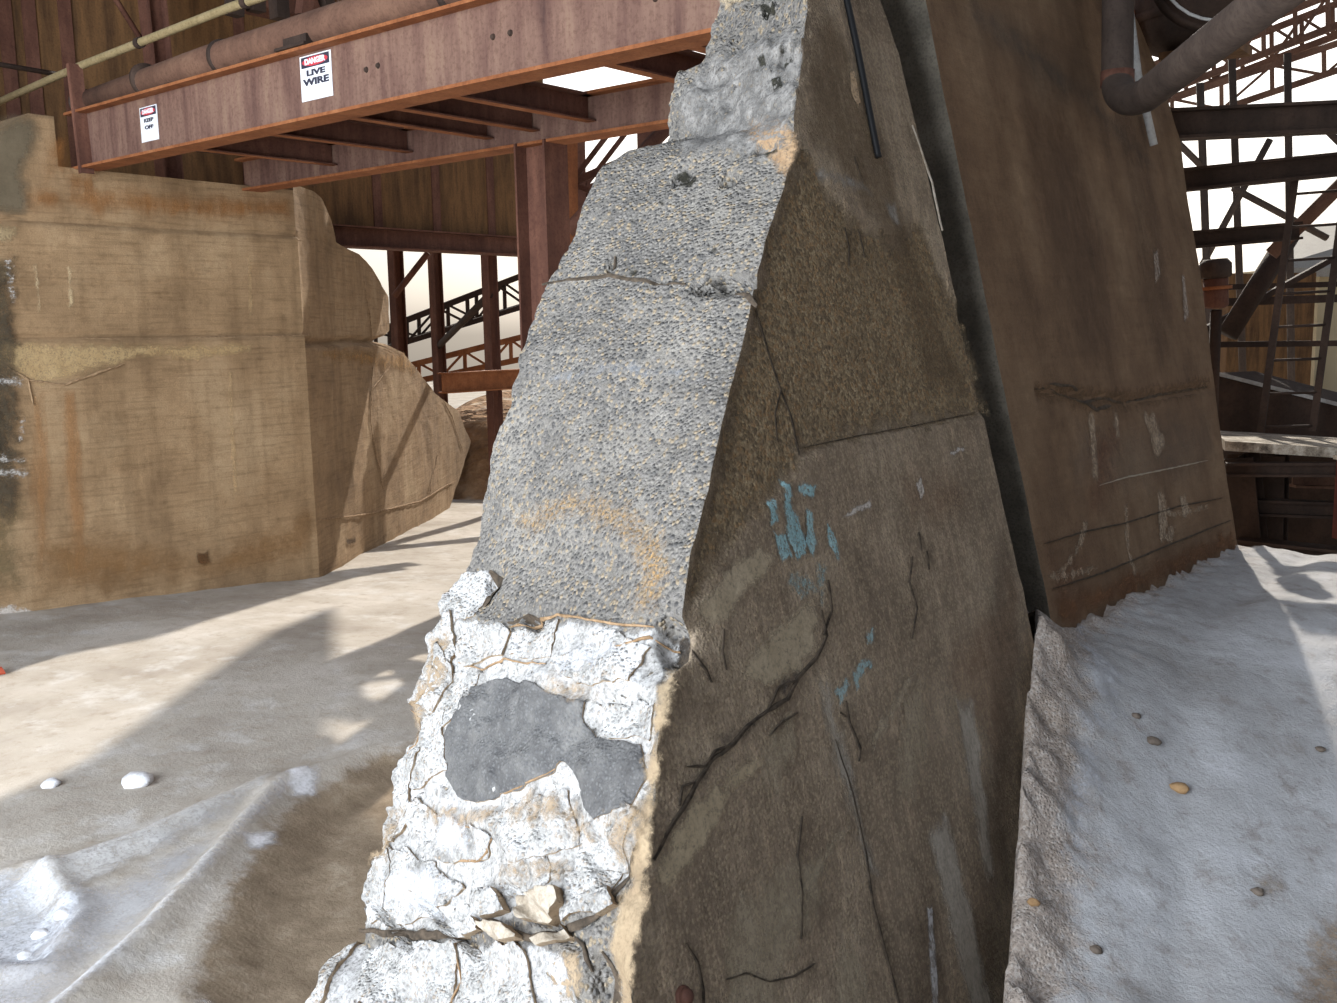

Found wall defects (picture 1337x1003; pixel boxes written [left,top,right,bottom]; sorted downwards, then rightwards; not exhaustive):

damp [0,260,25,580]
crack [542,256,972,456]
spalling [305,570,690,1003]
crack [358,580,833,1003]
crack [834,701,900,1003]